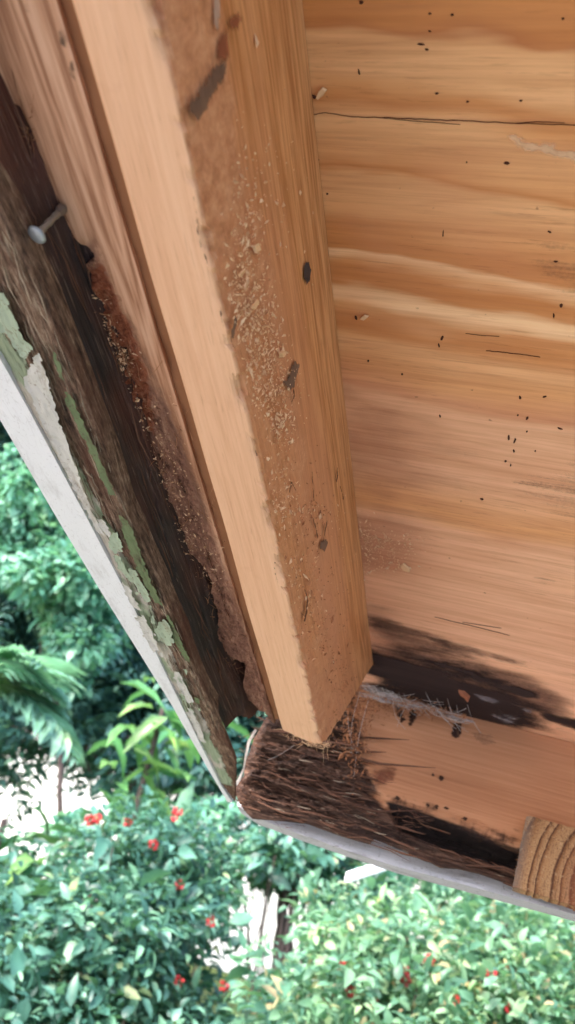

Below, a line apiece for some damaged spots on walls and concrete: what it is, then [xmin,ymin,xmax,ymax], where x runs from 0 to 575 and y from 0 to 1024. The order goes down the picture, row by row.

crack [314,112,575,126]
peeling [0,292,206,743]
leakage [366,618,575,738]
leakage [392,796,449,822]